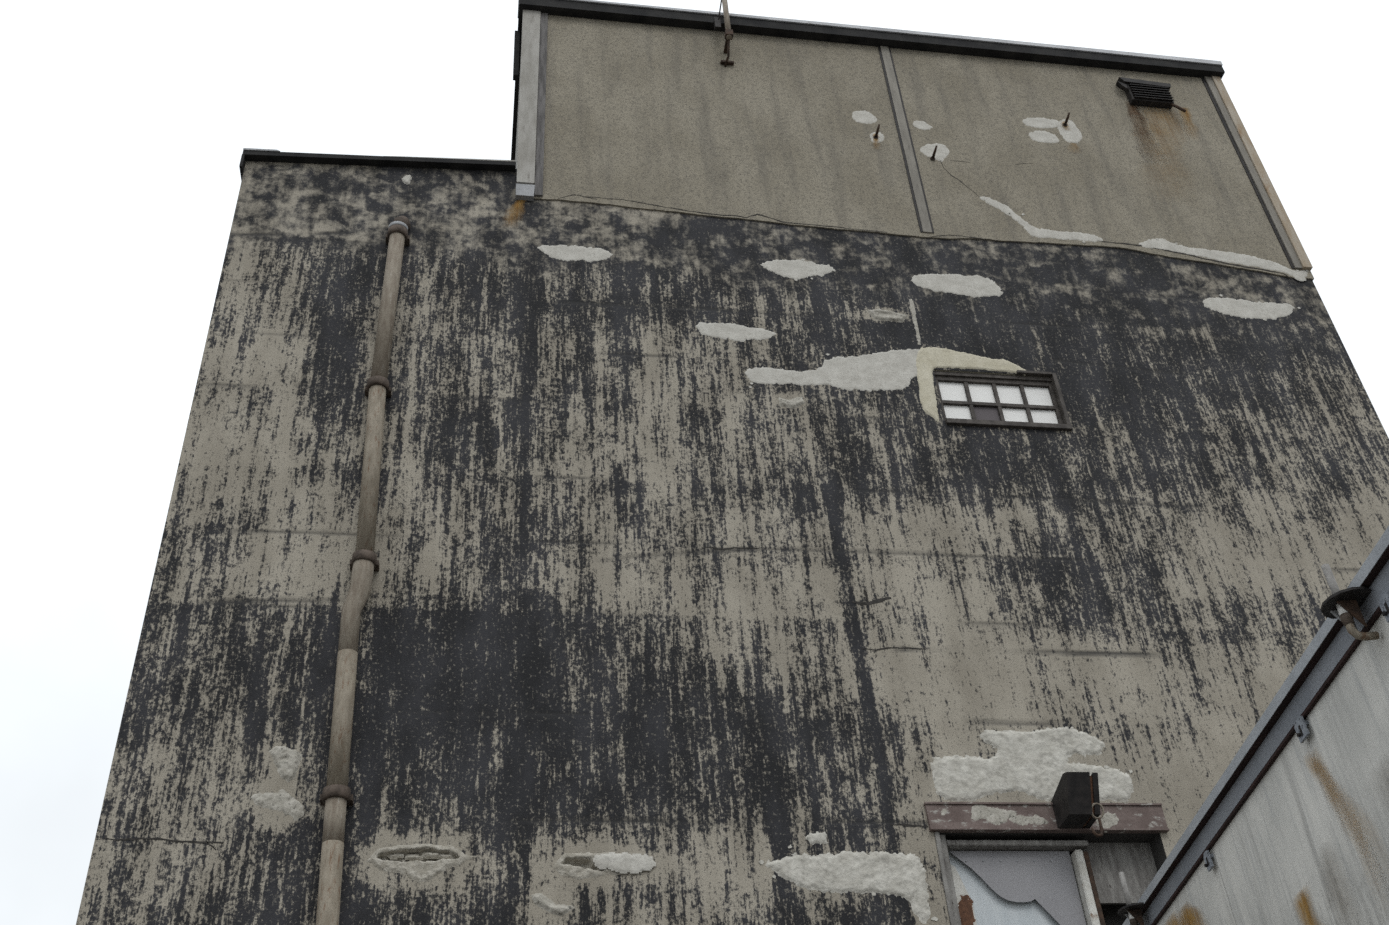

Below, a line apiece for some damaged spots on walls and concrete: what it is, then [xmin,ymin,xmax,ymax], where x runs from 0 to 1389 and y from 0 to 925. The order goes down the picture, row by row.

spalling [779,397,805,409]
spalling [366,844,477,883]
spalling [553,852,656,880]
rust [958,895,976,925]